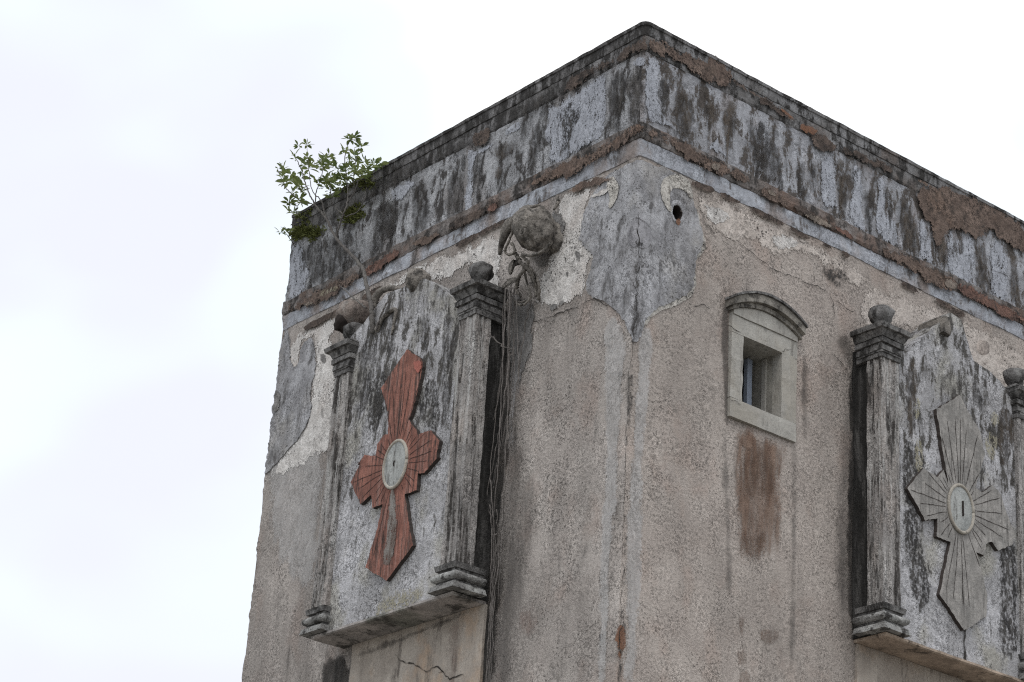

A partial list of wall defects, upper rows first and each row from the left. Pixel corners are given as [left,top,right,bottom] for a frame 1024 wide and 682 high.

leakage [301,134,510,286]
leakage [562,103,580,159]
peeling [531,39,794,311]
leakage [704,92,783,190]
spalling [632,133,1024,387]
leakage [864,186,918,257]
peeling [270,244,399,583]
leakage [355,312,395,431]
leakage [418,316,456,431]
leakage [902,358,931,613]
leakage [1000,546,1019,659]
crack [395,654,463,680]